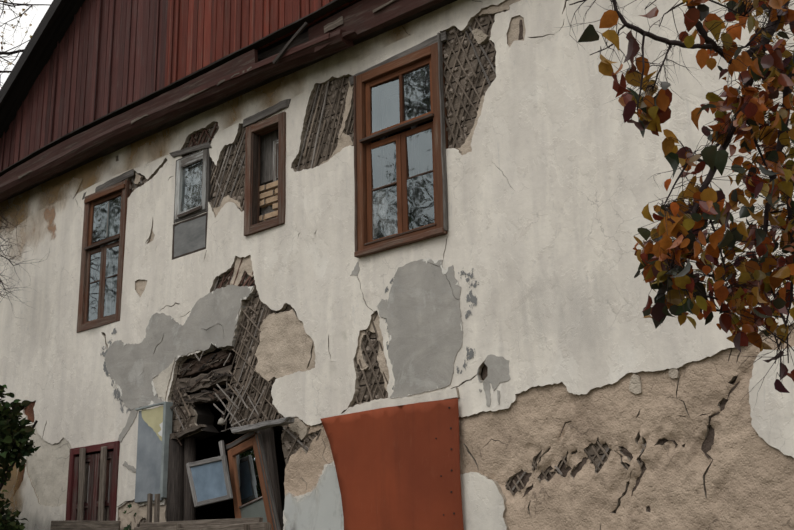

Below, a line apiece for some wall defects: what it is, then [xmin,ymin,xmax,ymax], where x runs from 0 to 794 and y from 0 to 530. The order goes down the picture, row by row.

spalling [184,122,219,157]
spalling [210,126,246,216]
spalling [295,75,354,172]
spalling [442,0,520,155]
spalling [353,278,395,406]
peeling [455,268,479,331]
spalling [164,256,344,530]
spalling [459,324,794,530]
crack [683,382,739,426]